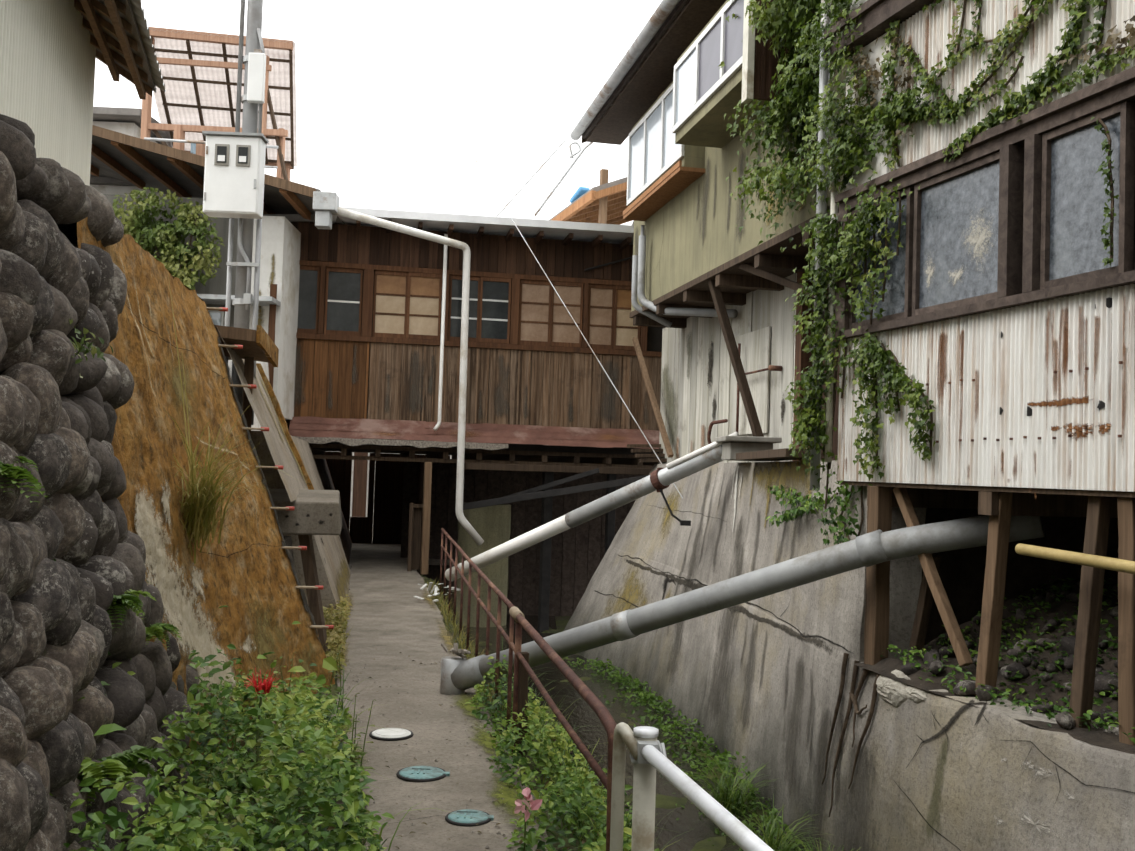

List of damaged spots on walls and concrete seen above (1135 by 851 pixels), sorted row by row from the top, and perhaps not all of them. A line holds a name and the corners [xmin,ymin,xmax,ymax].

corrosion [927,331,979,434]
corrosion [1027,295,1135,444]
crack [619,530,708,586]
damp [626,465,770,596]
damp [708,605,838,728]
crack [730,599,850,652]
damp [783,653,867,851]